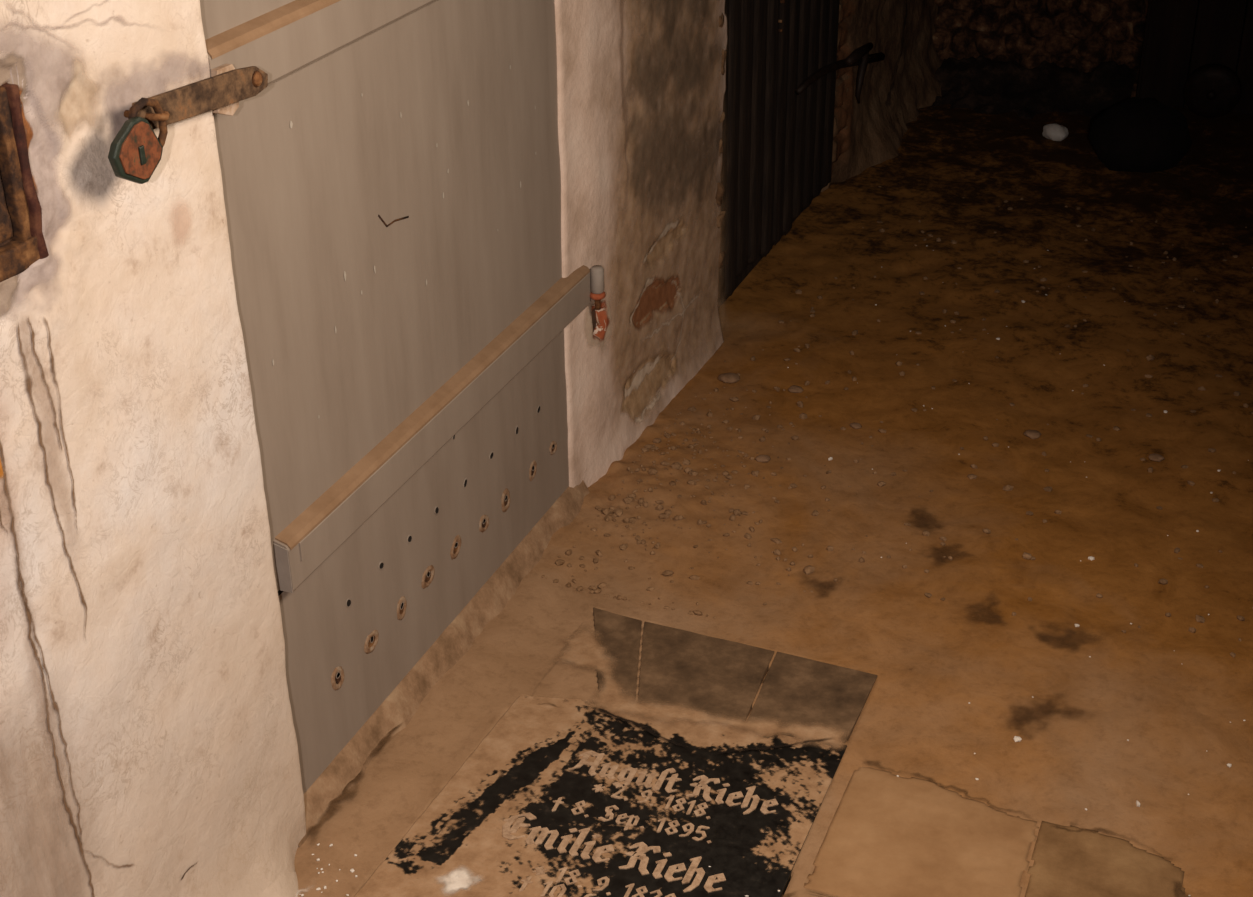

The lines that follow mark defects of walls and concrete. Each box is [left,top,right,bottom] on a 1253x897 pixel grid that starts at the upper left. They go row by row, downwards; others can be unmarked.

rust [19,88,33,148]
flaking render [0,32,98,317]
damp [611,0,722,392]
flaking render [585,299,611,347]
peeling [630,276,679,329]